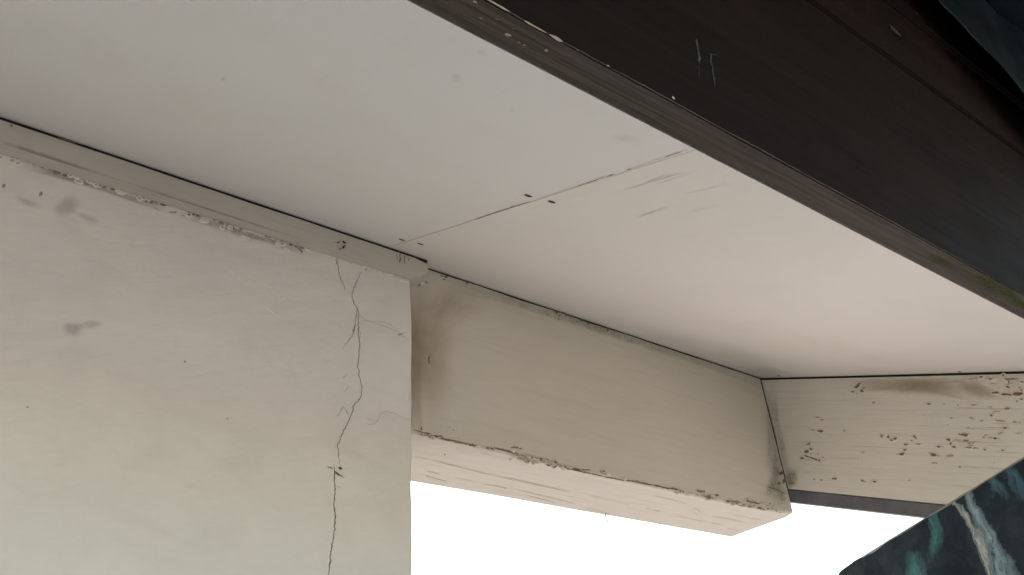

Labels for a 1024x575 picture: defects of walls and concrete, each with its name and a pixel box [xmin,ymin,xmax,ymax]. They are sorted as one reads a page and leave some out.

peeling [0,154,319,253]
crack [325,259,409,575]
peeling [414,426,785,513]
peeling [799,416,825,462]
spalling [879,373,1024,468]